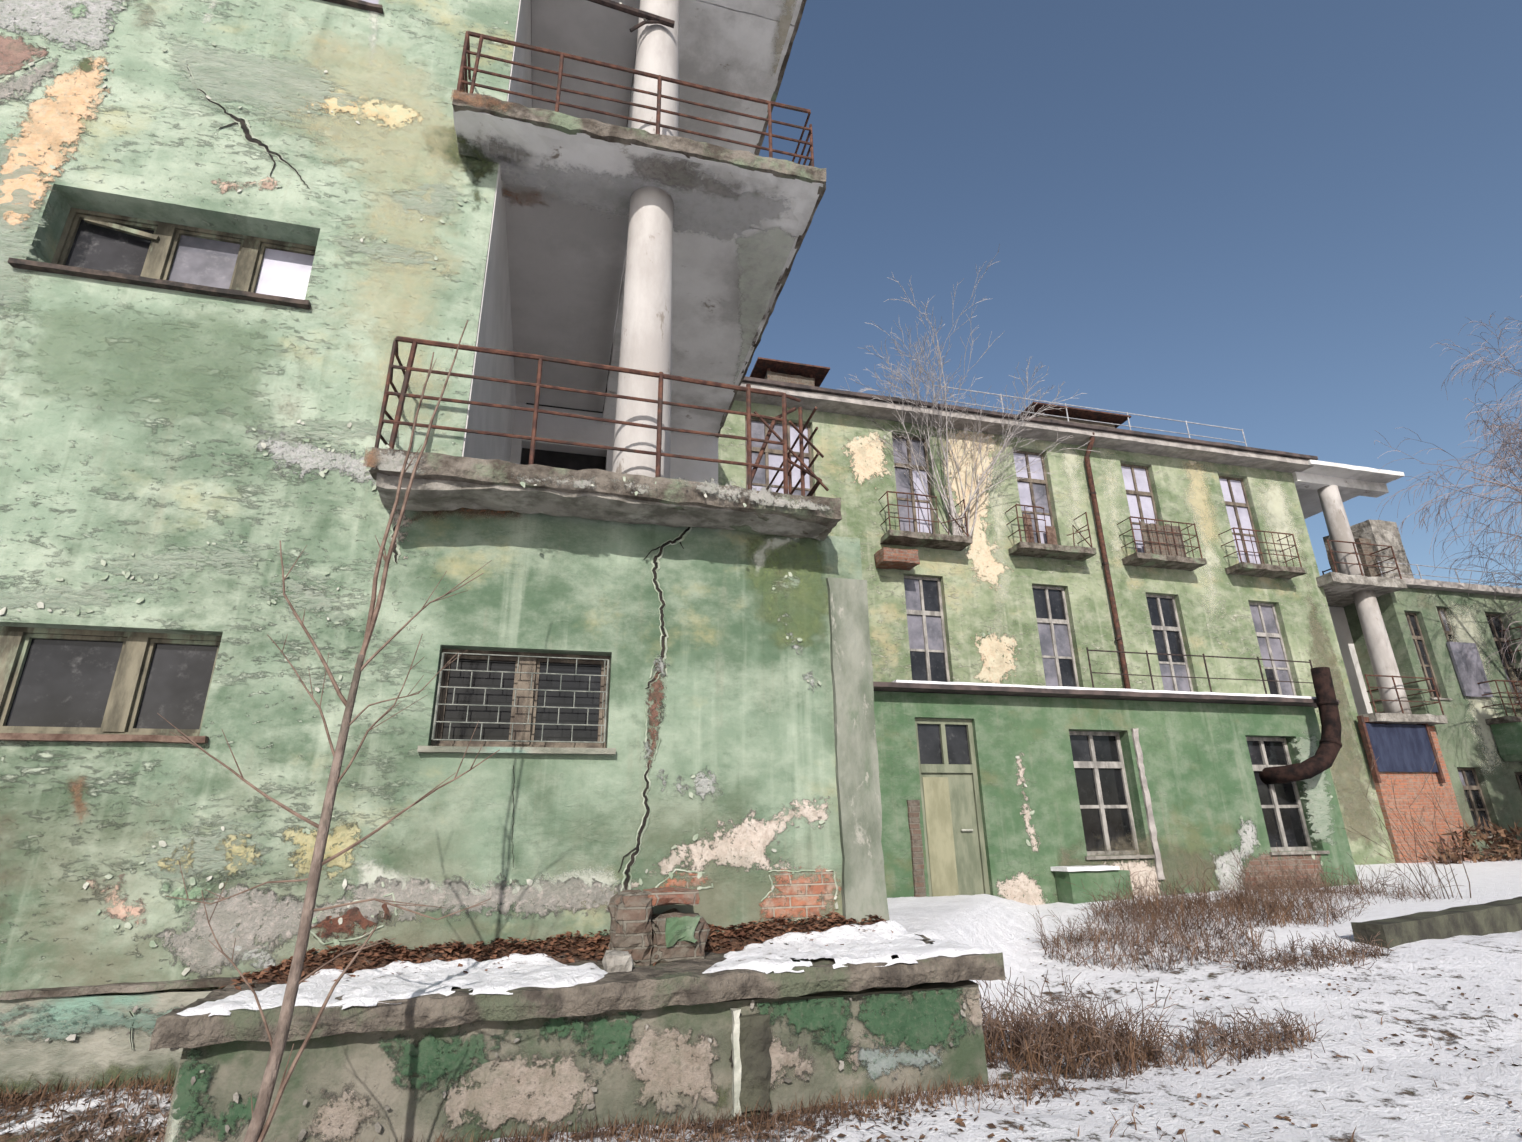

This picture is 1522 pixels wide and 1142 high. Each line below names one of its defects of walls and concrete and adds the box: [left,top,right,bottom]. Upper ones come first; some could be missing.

peeling [0,0,136,318]
crack [186,63,309,188]
rust [414,507,520,520]
peeling [938,428,1014,593]
crack [644,527,692,689]
peeling [971,628,1022,684]
spalling [83,797,841,988]
crack [618,760,651,891]
spalling [996,871,1050,905]
peeling [1015,753,1045,857]
peeling [1209,732,1335,891]
spalling [297,1011,727,1142]